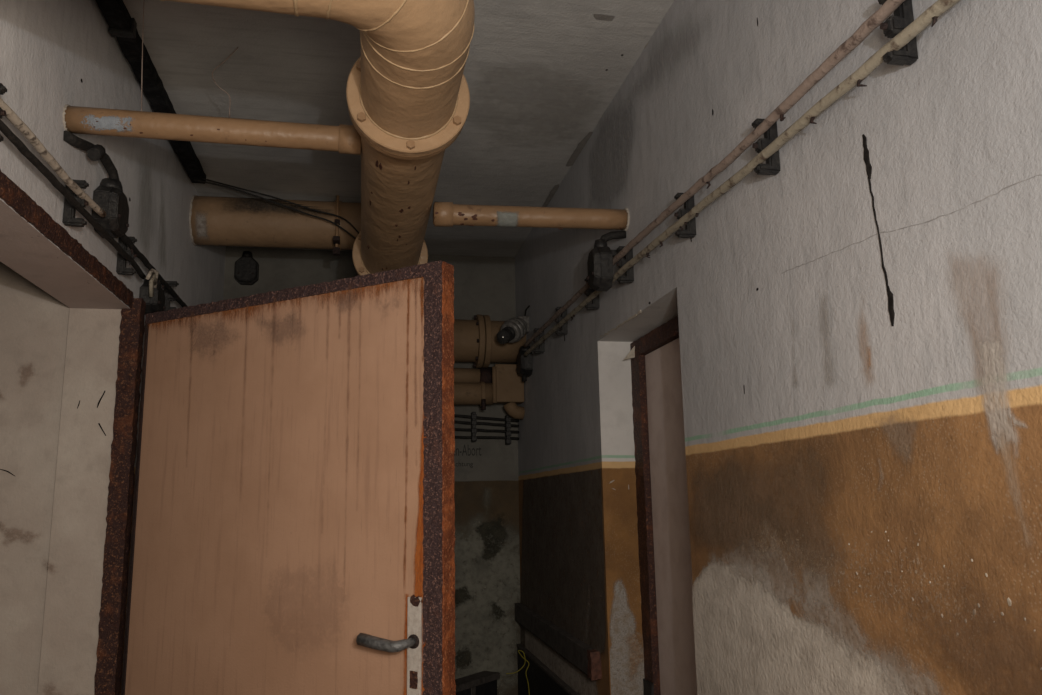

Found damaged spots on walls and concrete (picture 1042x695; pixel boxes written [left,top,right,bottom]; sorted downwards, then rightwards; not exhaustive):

crack [783,134,1042,326]
efflorescence [981,342,1024,501]
mould [455,587,470,606]
peeling [454,519,598,695]
peeling [610,581,645,695]